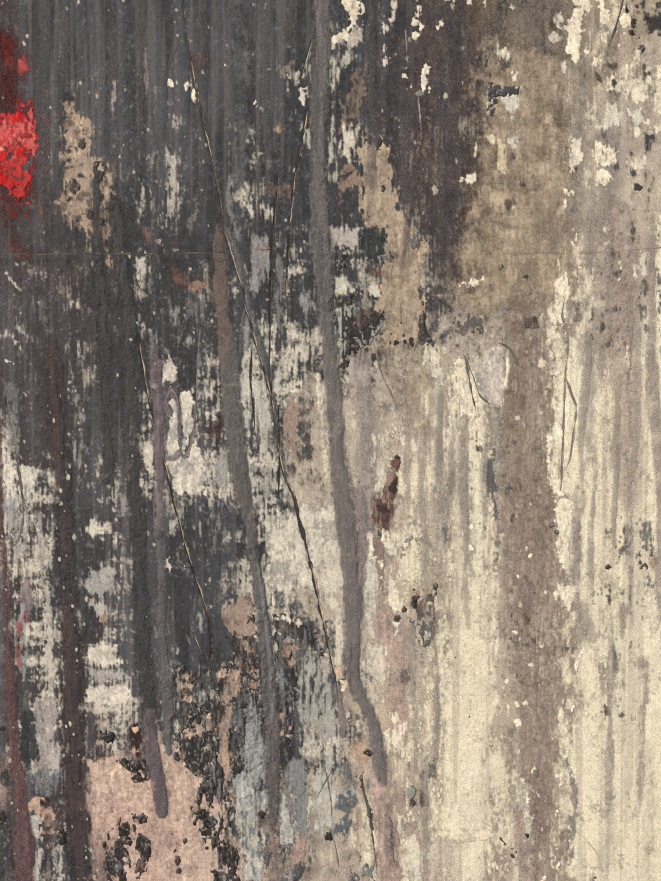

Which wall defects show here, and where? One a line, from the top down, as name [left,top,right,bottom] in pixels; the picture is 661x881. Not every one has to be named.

peeling [136,186,179,299]
peeling [150,354,177,390]
peeling [226,175,288,330]
peeling [239,315,287,454]
peeling [299,287,316,314]
peeling [328,0,517,562]
peeling [453,0,661,376]
water stain [609,204,637,504]
peeling [79,373,375,881]
water stain [495,279,582,881]
peeling [382,711,410,765]
peeling [366,763,436,881]